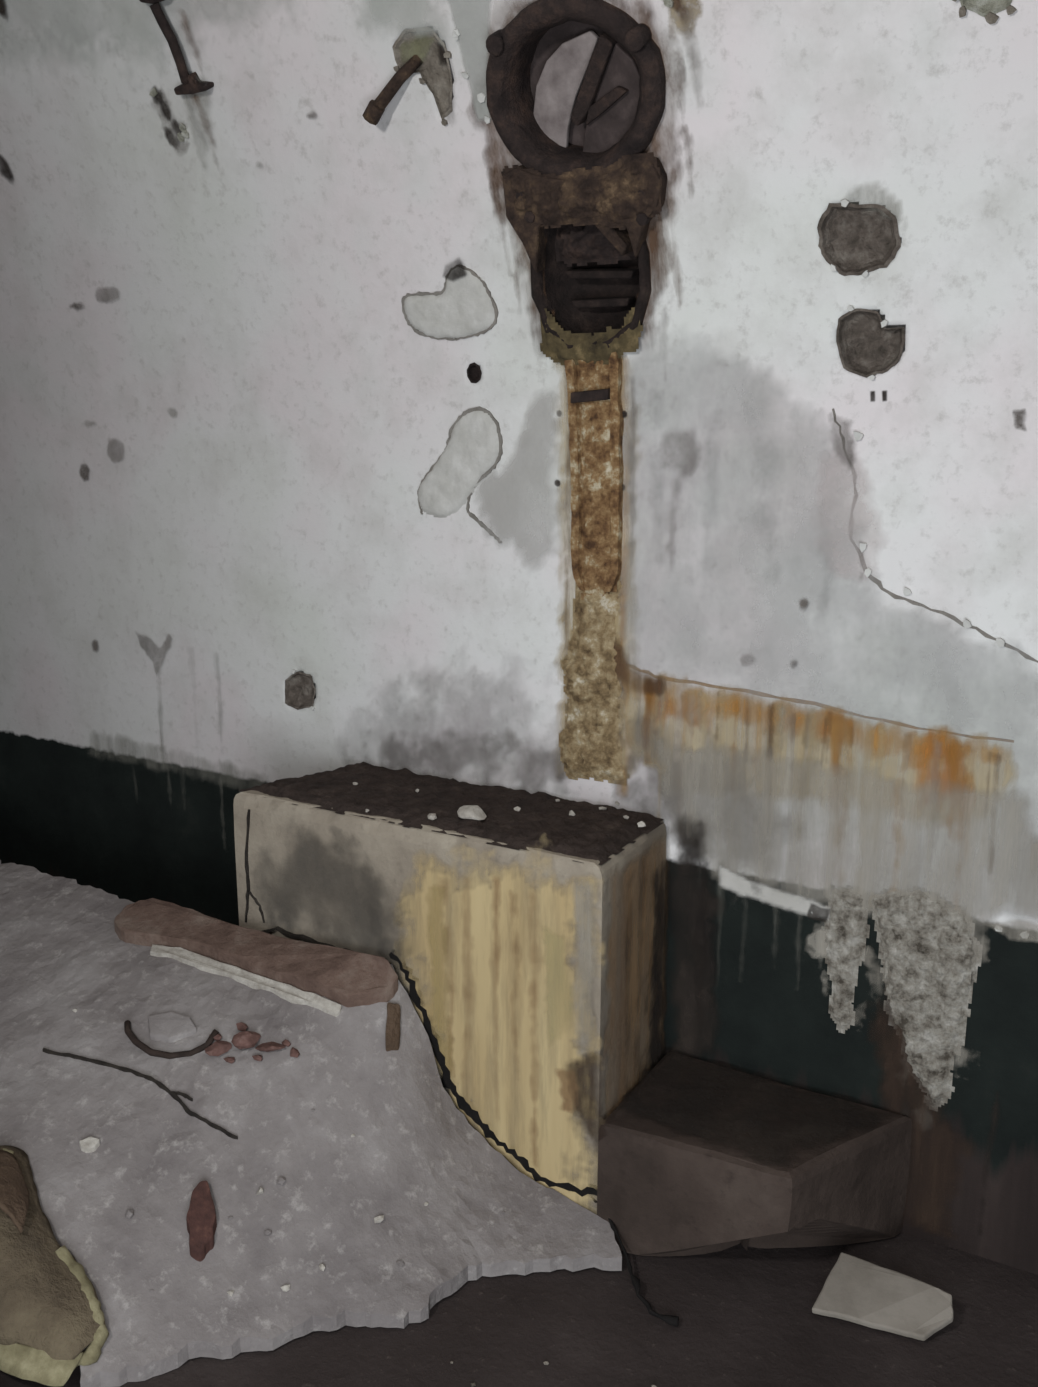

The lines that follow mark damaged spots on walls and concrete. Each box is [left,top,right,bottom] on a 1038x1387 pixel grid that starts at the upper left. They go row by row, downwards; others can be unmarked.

rust [497,0,537,29]
spalling [952,0,1017,24]
rust [473,103,522,213]
rust [642,127,676,330]
spalling [817,199,901,278]
spalling [836,305,905,380]
rust [560,355,1014,820]
spalling [285,670,316,711]
crack [245,809,353,951]
leakage [621,746,881,1164]
leakage [755,758,1038,1112]
crack [389,950,679,1327]